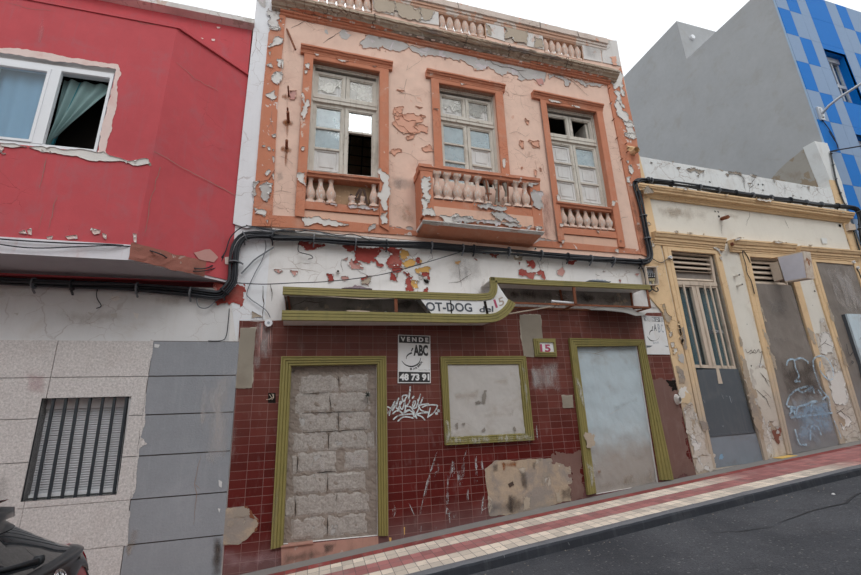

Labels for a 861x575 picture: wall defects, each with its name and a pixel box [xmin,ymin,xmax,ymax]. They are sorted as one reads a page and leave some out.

peeling [0,48,151,166]
peeling [392,106,438,152]
peeling [258,0,637,139]
spalling [252,134,276,223]
peeling [296,241,326,251]
peeling [284,245,431,313]
spalling [650,299,716,481]
peeling [739,336,786,459]
spalling [807,318,861,443]
spalling [485,432,595,516]
spalling [218,506,258,545]